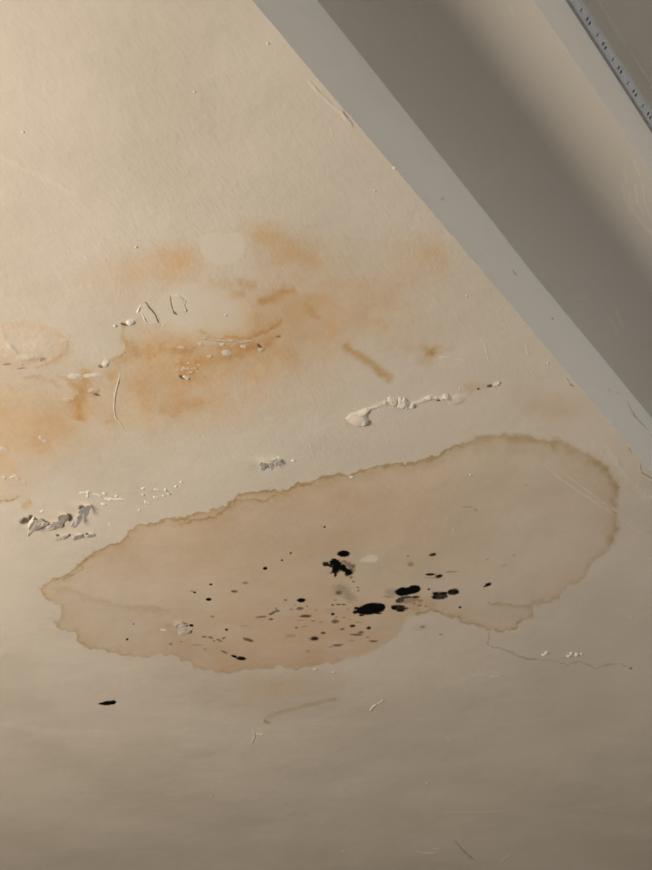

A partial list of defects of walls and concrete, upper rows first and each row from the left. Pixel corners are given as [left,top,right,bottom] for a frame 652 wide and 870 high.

peeling [21,505,95,541]
mould [323,551,353,577]
mould [350,585,459,627]